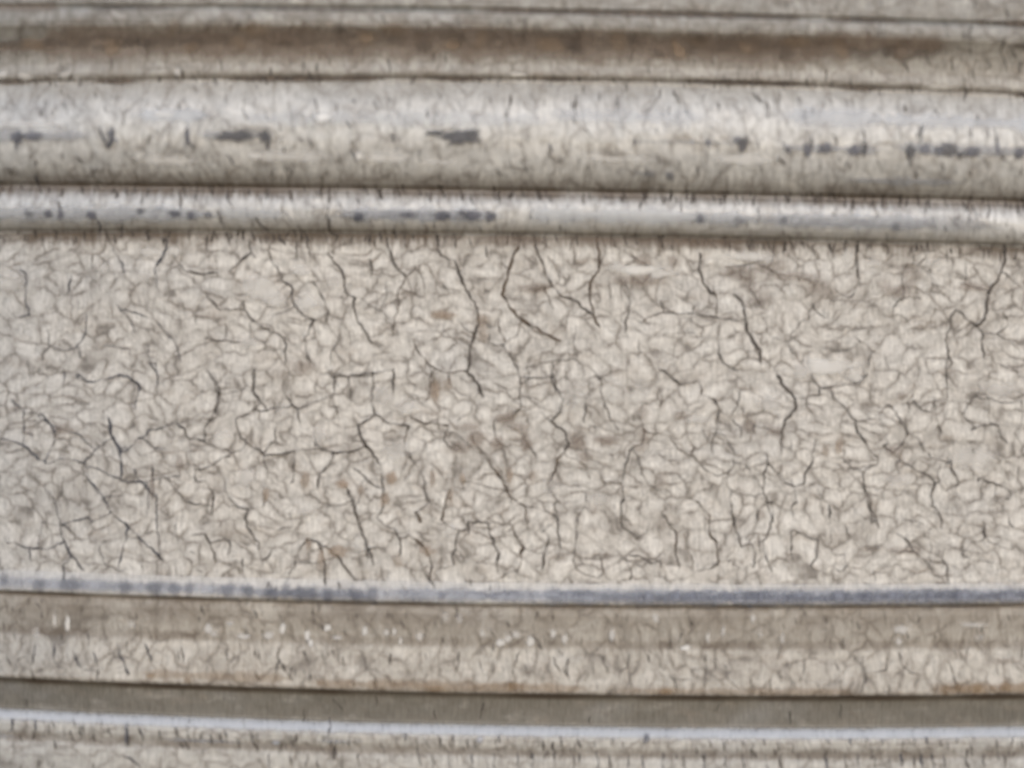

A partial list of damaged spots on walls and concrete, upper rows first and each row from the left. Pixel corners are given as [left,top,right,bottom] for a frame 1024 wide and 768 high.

crack [0,66,1024,601]
crack [246,607,392,704]
crack [456,631,568,686]
crack [11,718,95,768]
crack [175,728,227,749]
crack [253,713,359,768]
crack [530,718,782,768]